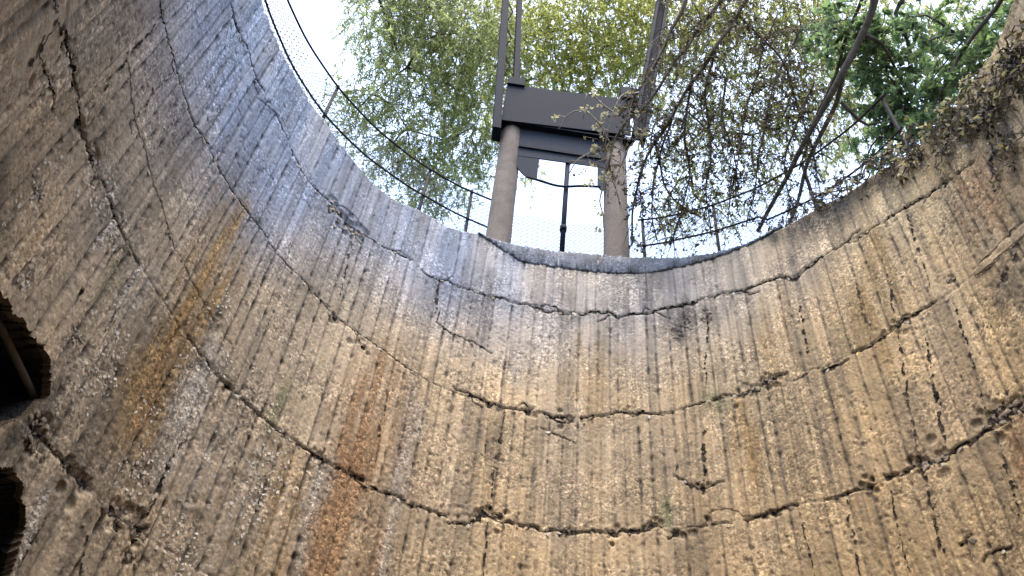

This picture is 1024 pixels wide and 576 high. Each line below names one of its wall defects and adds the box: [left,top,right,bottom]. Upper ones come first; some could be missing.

crack [29,0,141,266]
corrosion [120,206,245,436]
crack [127,1,974,539]
crack [27,427,151,544]
corrosion [307,351,396,576]
crack [827,401,1024,500]